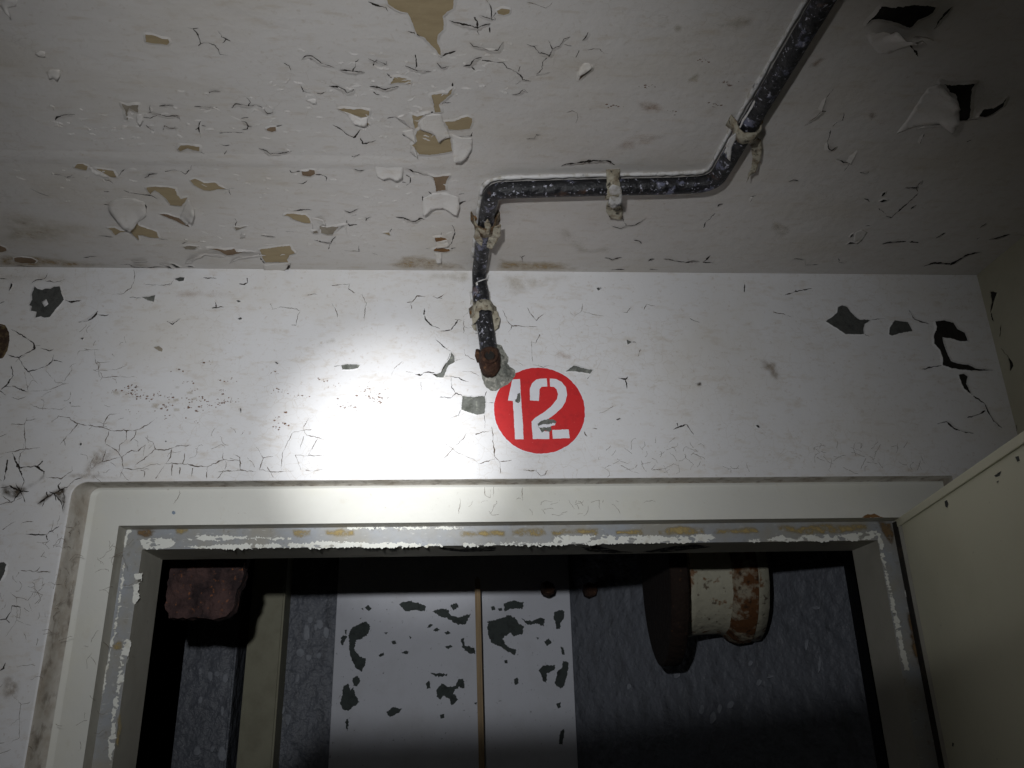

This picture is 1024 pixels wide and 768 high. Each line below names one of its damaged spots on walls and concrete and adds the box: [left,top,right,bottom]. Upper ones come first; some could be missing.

peeling [269,0,513,264]
spalling [28,275,80,319]
spalling [415,338,491,420]
spalling [824,304,876,336]
spalling [924,318,995,397]
crack [0,272,325,754]
peeling [124,526,458,551]
peeling [463,534,716,548]
peeling [102,563,142,760]
peeling [340,605,372,731]
peeling [400,600,475,654]
peeling [487,600,569,689]